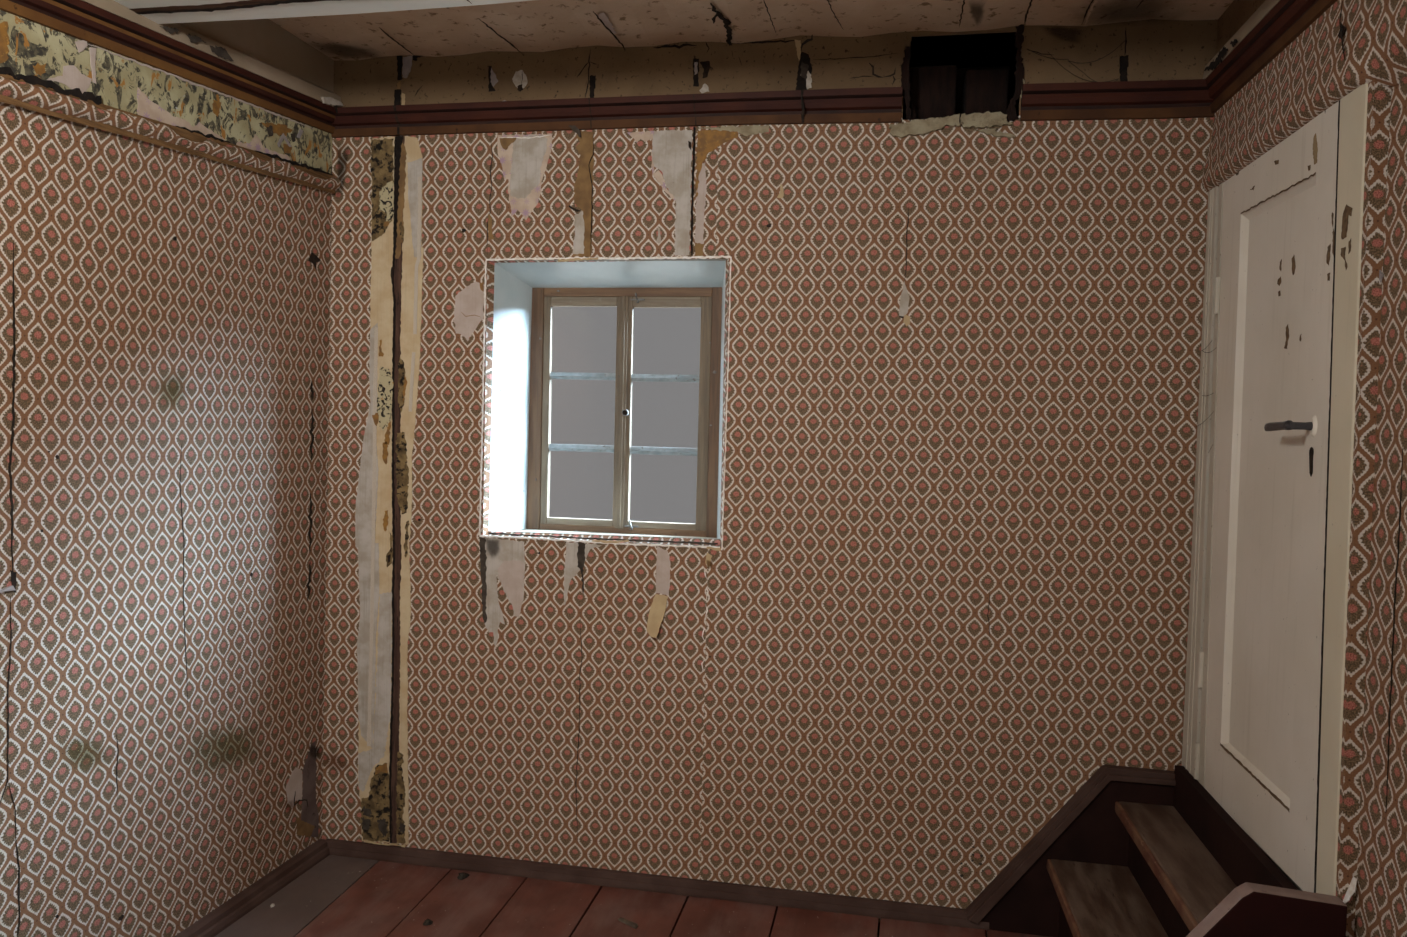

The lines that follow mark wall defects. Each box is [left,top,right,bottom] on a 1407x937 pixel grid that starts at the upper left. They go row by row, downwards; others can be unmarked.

peeling [160,26,233,61]
flaking render [321,97,343,106]
crack [577,0,899,128]
spalling [889,24,1025,139]
peeling [500,138,516,150]
peeling [1277,255,1296,296]
peeling [1326,204,1353,281]
crack [0,243,20,937]